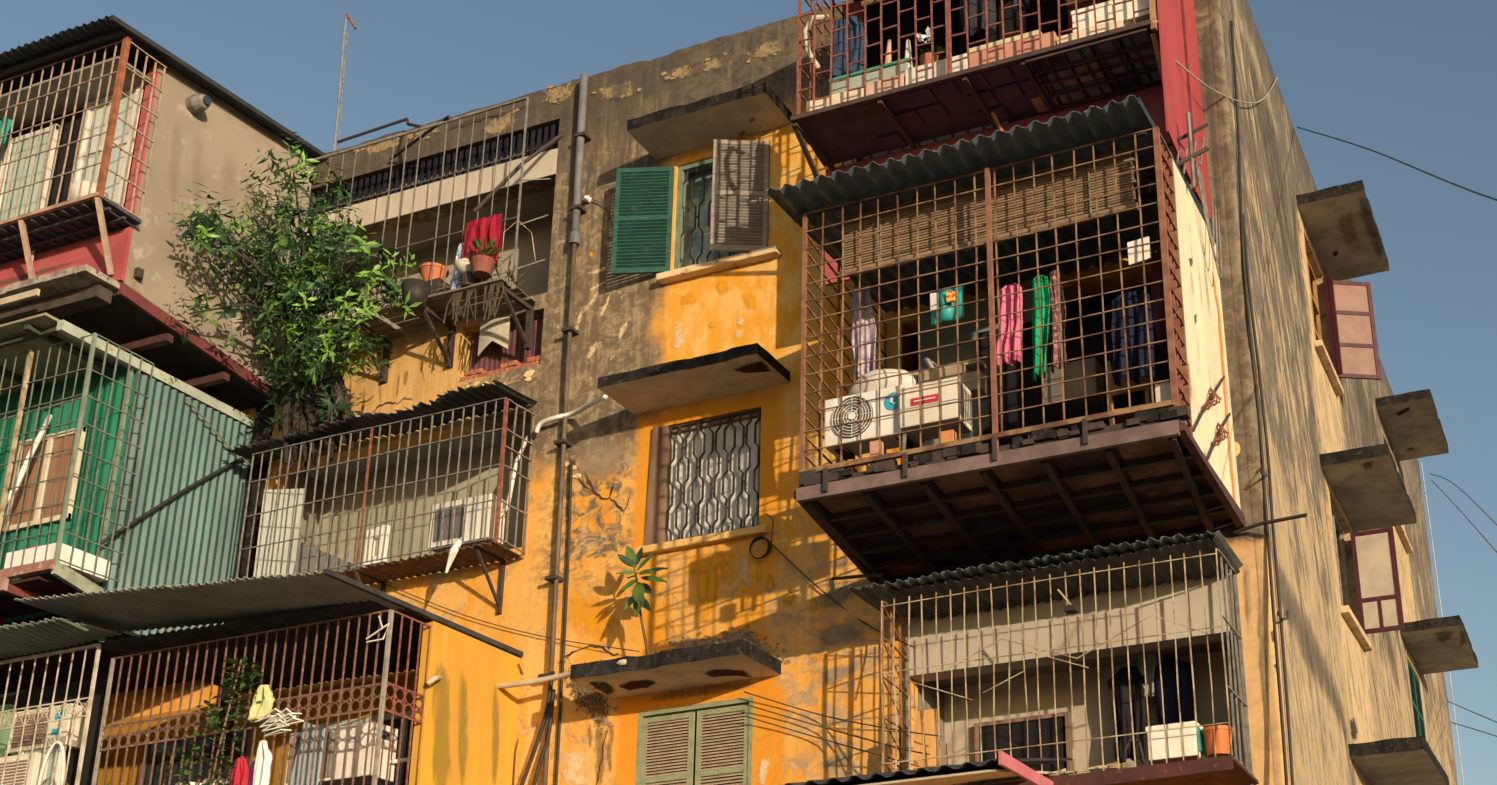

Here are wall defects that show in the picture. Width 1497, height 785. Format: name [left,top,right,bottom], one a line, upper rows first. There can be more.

peeling [661,36,781,80]
peeling [541,83,575,104]
peeling [592,81,642,99]
damp [1253,72,1303,296]
rust [1189,258,1236,502]
damp [689,552,731,618]
spalling [656,624,790,664]
damp [589,682,614,697]
damp [588,727,613,780]